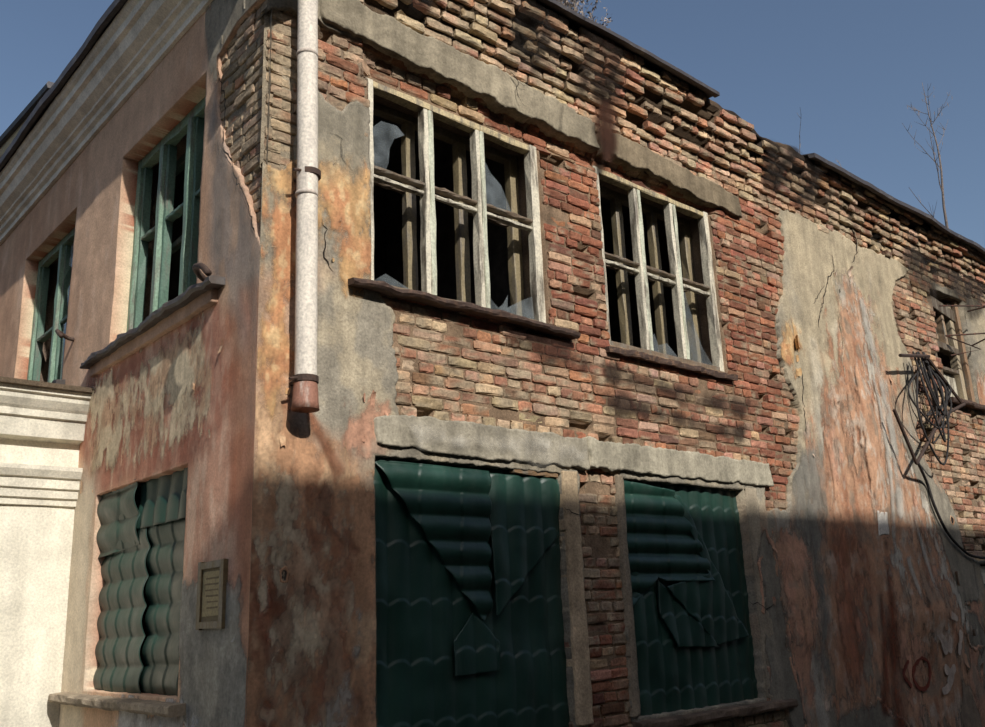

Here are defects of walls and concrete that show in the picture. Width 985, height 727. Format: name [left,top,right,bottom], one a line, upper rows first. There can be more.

crack [217,68,255,233]
leakage [581,50,620,96]
peeling [90,314,211,472]
peeling [111,0,390,727]
flaking render [318,23,985,727]
crack [813,227,858,377]